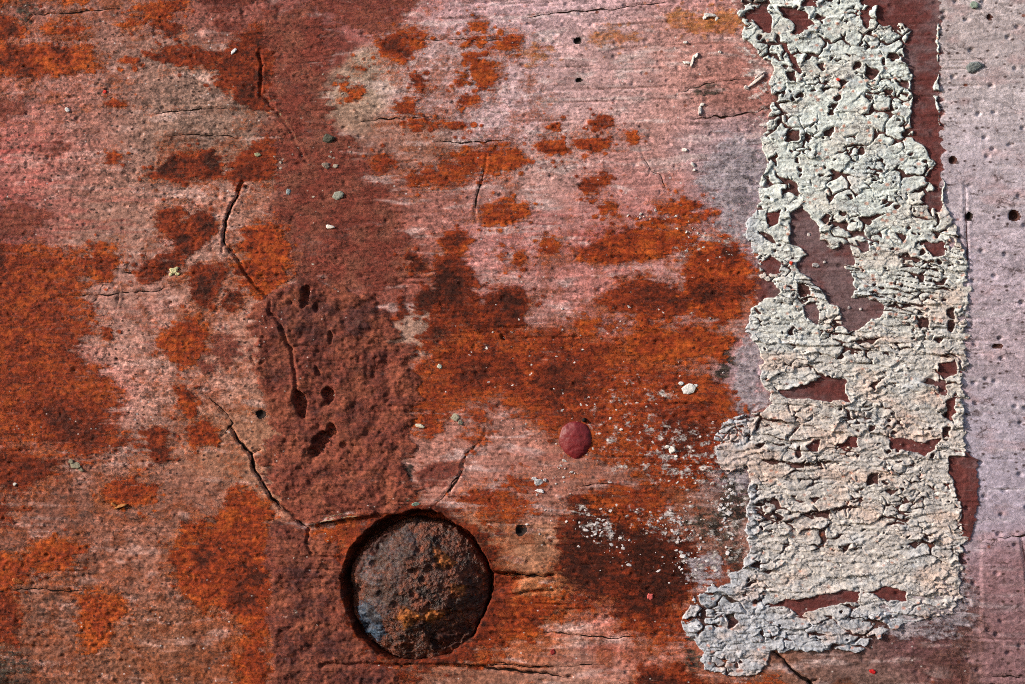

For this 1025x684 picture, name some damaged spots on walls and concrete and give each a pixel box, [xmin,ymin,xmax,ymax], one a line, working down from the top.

rust [0,0,280,122]
rust [96,141,130,167]
rust [138,135,280,195]
crack [223,183,243,262]
rust [0,198,297,527]
rust [304,0,783,684]
peeling [681,0,980,677]
crack [202,393,310,544]
rust [0,529,90,661]
rust [68,584,138,655]
rust [158,476,283,684]
crack [773,652,816,684]